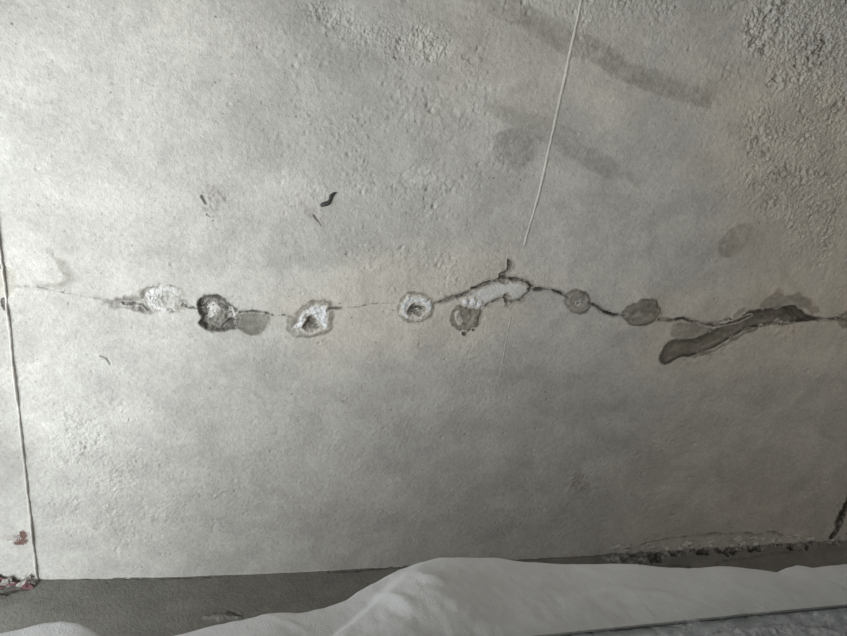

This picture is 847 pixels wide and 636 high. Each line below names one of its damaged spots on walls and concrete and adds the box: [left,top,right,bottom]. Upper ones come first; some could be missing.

crack [15,285,110,301]
spalling [100,282,241,335]
crack [180,302,210,310]
crack [325,302,402,313]
crack [430,256,628,319]
leakage [561,287,591,316]
leakage [620,297,748,340]
crack [655,313,753,329]
leakage [758,286,822,315]
crack [816,315,847,323]
crack [828,494,847,540]
spalling [599,529,847,565]